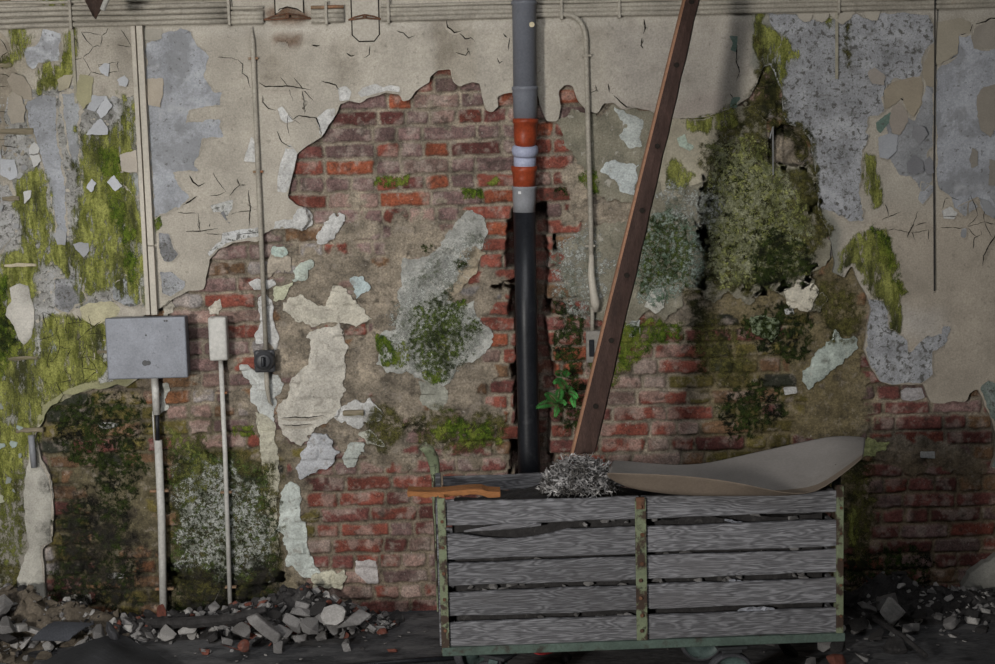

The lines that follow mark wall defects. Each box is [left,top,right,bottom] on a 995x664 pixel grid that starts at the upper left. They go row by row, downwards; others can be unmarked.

crack [346,47,372,59]
crack [396,31,416,41]
crack [221,57,339,149]
peeling [730,11,995,225]
crack [179,173,255,235]
crack [885,197,995,265]
flaking render [0,25,518,615]
flaking render [535,85,995,592]
water stain [48,496,159,610]
water stain [183,565,279,610]